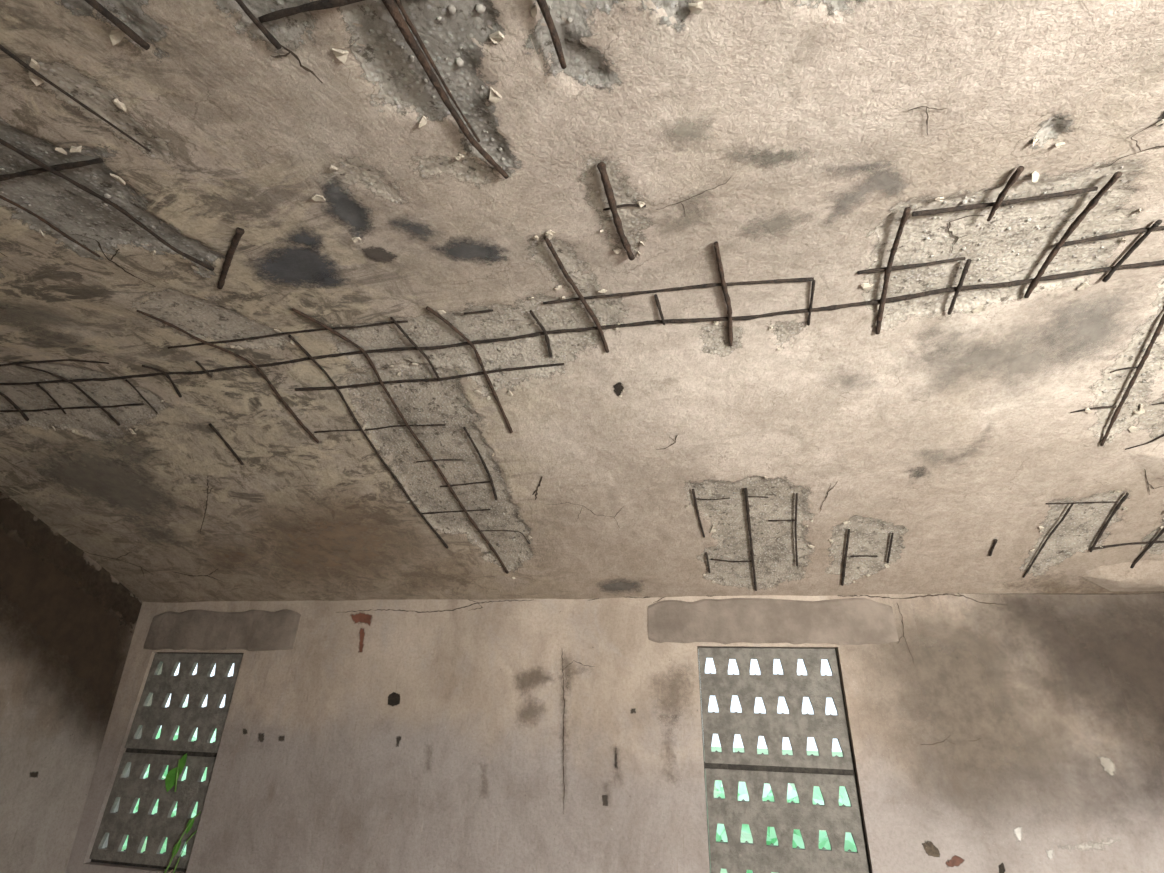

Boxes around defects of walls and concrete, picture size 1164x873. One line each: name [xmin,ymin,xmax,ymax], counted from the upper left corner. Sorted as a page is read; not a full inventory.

spalling [55,0,170,62]
spalling [522,0,703,93]
spalling [779,0,868,20]
spalling [214,0,522,189]
leakage [255,227,344,288]
leakage [323,178,397,263]
leakage [389,219,506,261]
spalling [0,44,1164,591]
leakage [0,491,138,732]
corrosion [351,613,372,652]
leakage [889,623,1067,808]
leakage [997,582,1164,791]